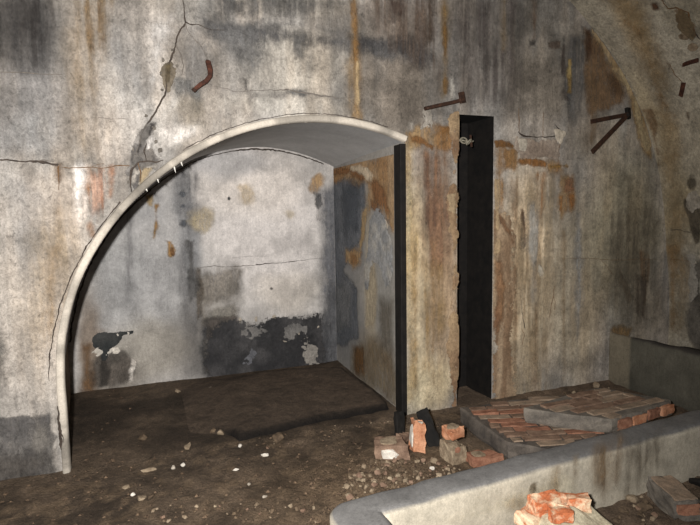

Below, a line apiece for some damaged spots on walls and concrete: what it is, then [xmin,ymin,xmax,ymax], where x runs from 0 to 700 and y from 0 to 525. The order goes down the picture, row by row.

rust [351,4,360,117]
rust [408,126,452,150]
crack [0,2,388,378]
rust [494,140,575,217]
peeling [92,331,133,361]